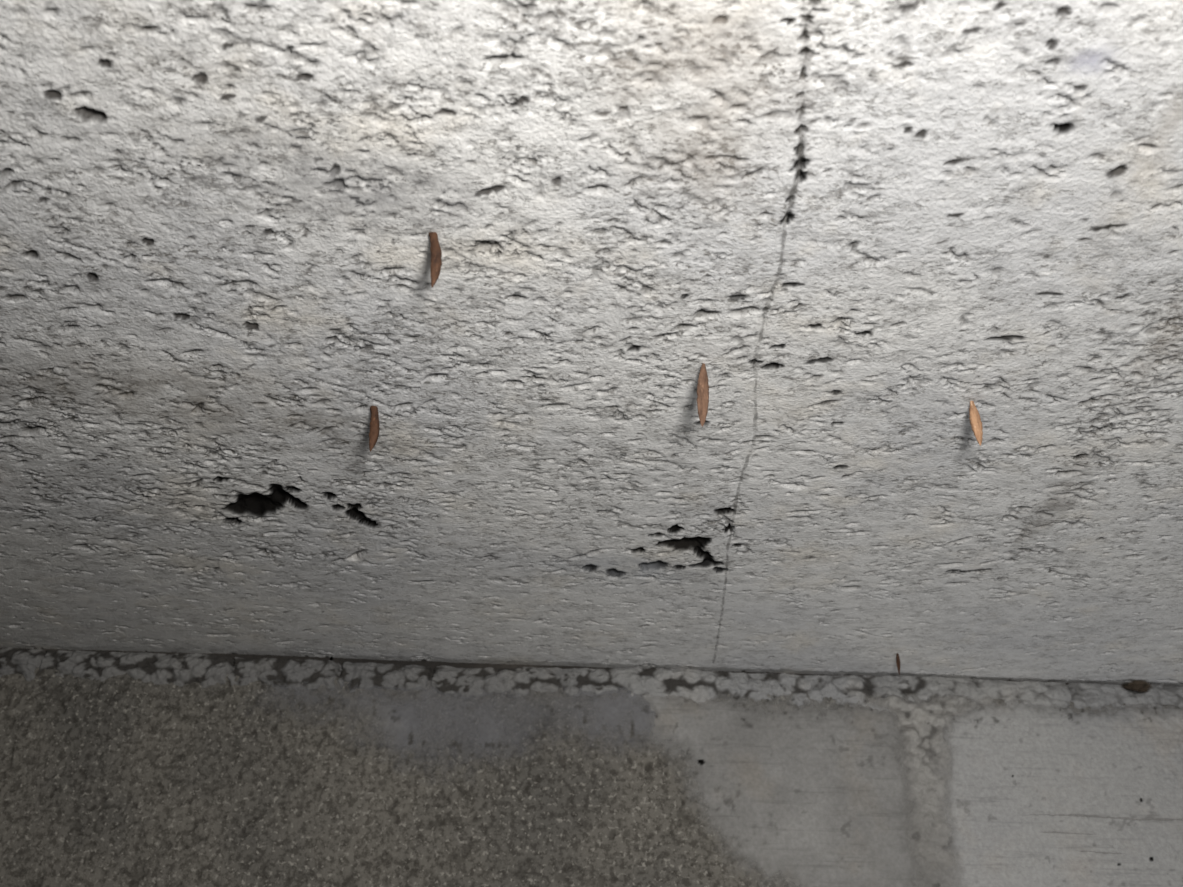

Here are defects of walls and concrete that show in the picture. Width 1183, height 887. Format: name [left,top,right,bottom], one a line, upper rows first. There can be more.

crack [781,0,818,223]
spalling [221,484,307,524]
spalling [322,492,378,528]
spalling [715,507,735,533]
spalling [632,524,726,573]
spalling [582,564,625,577]